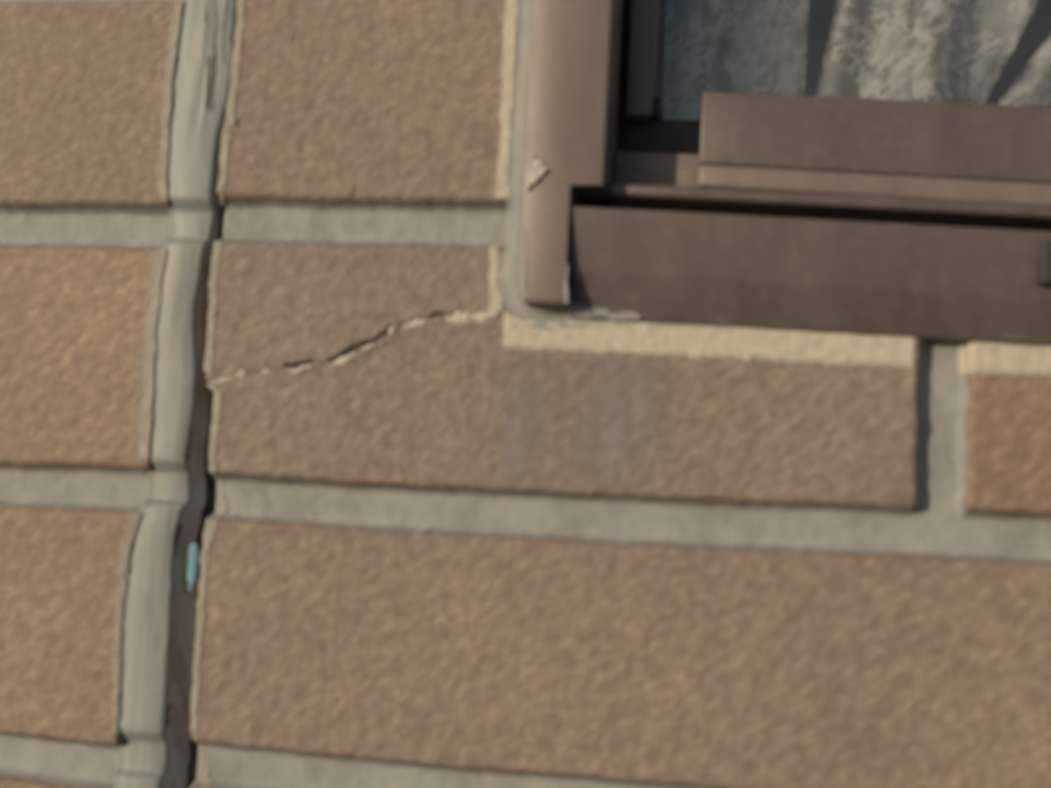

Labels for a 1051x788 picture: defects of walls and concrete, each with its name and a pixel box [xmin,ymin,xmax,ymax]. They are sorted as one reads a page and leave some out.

crack [204,309,503,385]